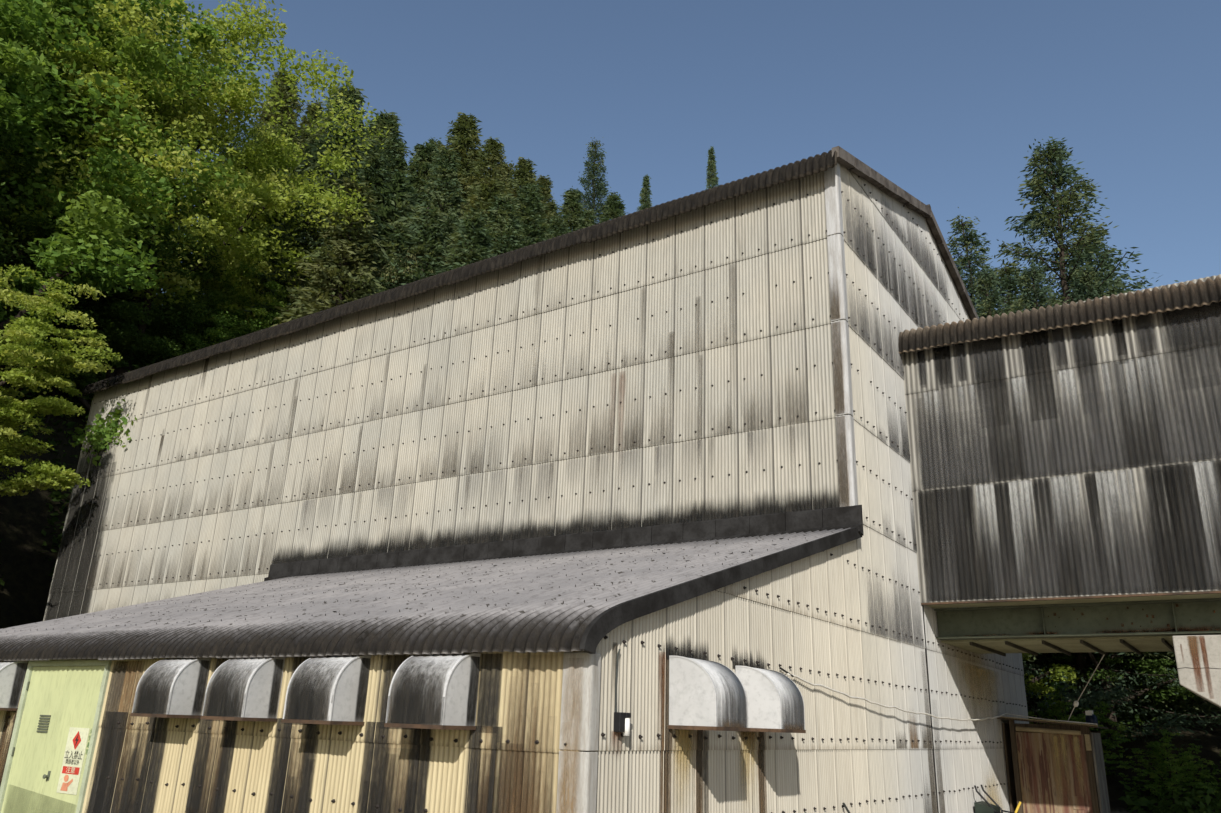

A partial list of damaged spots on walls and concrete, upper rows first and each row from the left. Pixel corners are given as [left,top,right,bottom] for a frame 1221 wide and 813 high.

damp [830,295,839,319]
damp [847,222,930,328]
damp [885,211,948,300]
damp [272,339,849,564]
damp [890,301,1221,600]
corrosion [1103,607,1215,690]
damp [0,662,28,786]
damp [87,676,173,813]
damp [185,658,246,813]
damp [265,657,334,813]
damp [355,655,442,813]